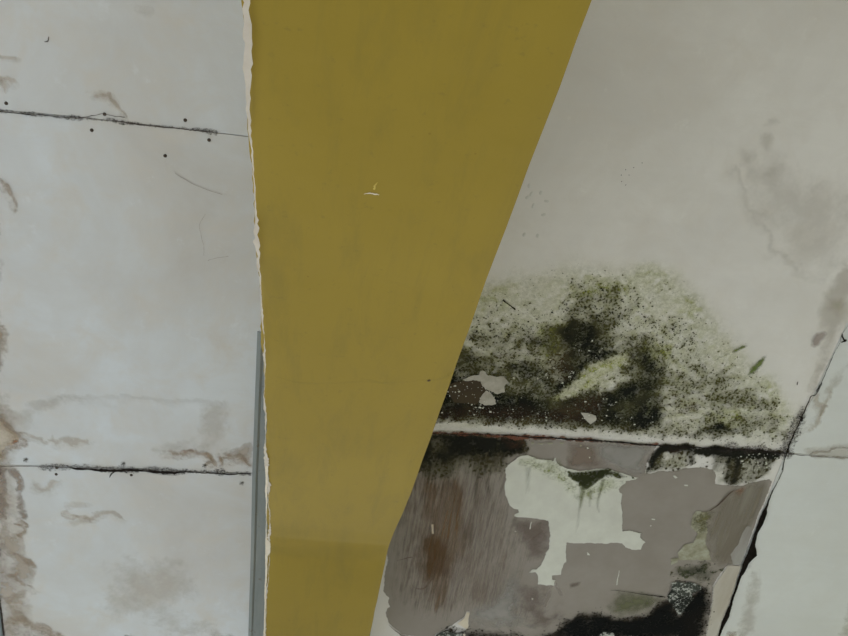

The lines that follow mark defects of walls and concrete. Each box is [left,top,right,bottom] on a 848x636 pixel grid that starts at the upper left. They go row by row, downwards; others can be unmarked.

damp [0,109,217,135]
damp [0,455,251,484]
peeling [383,438,772,636]
damp [418,270,794,636]
crack [718,325,848,636]